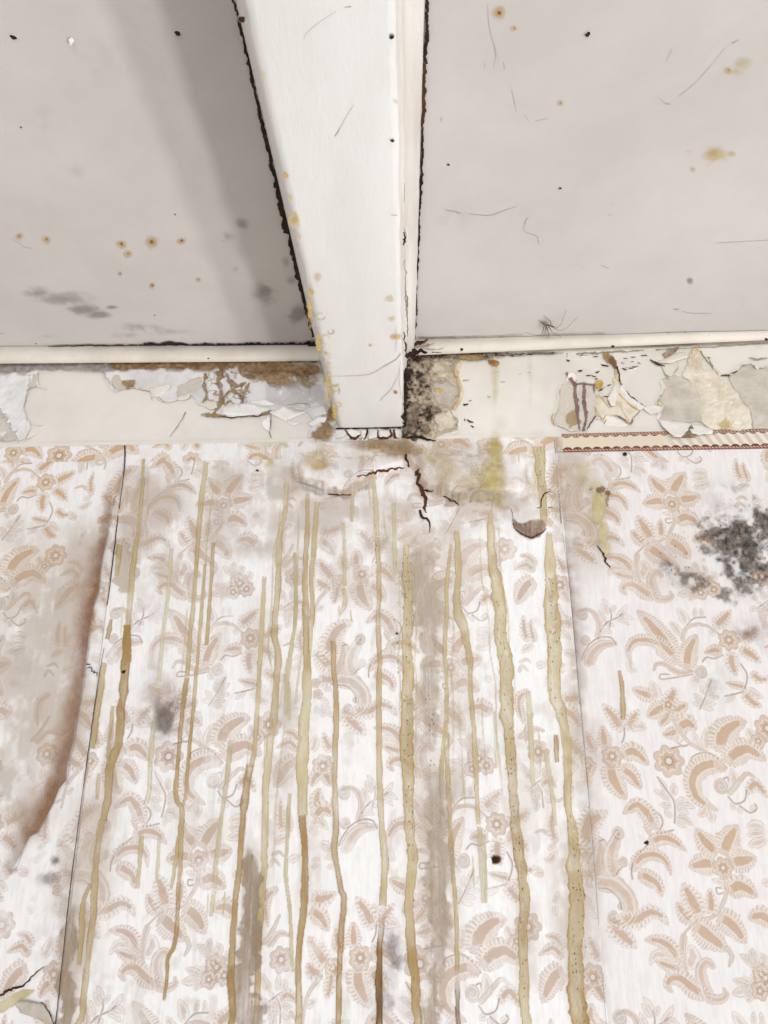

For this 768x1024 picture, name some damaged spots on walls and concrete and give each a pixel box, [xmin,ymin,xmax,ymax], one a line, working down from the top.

peeling [0,370,47,441]
peeling [101,260,474,443]
leakage [358,439,412,455]
crack [296,454,502,533]
peeling [551,347,768,438]
mould [660,546,707,590]
mould [683,505,768,601]
leakage [24,459,145,1024]
leakage [148,463,215,1000]
leakage [209,484,320,1024]
leakage [331,469,487,1024]
leakage [481,446,589,1024]